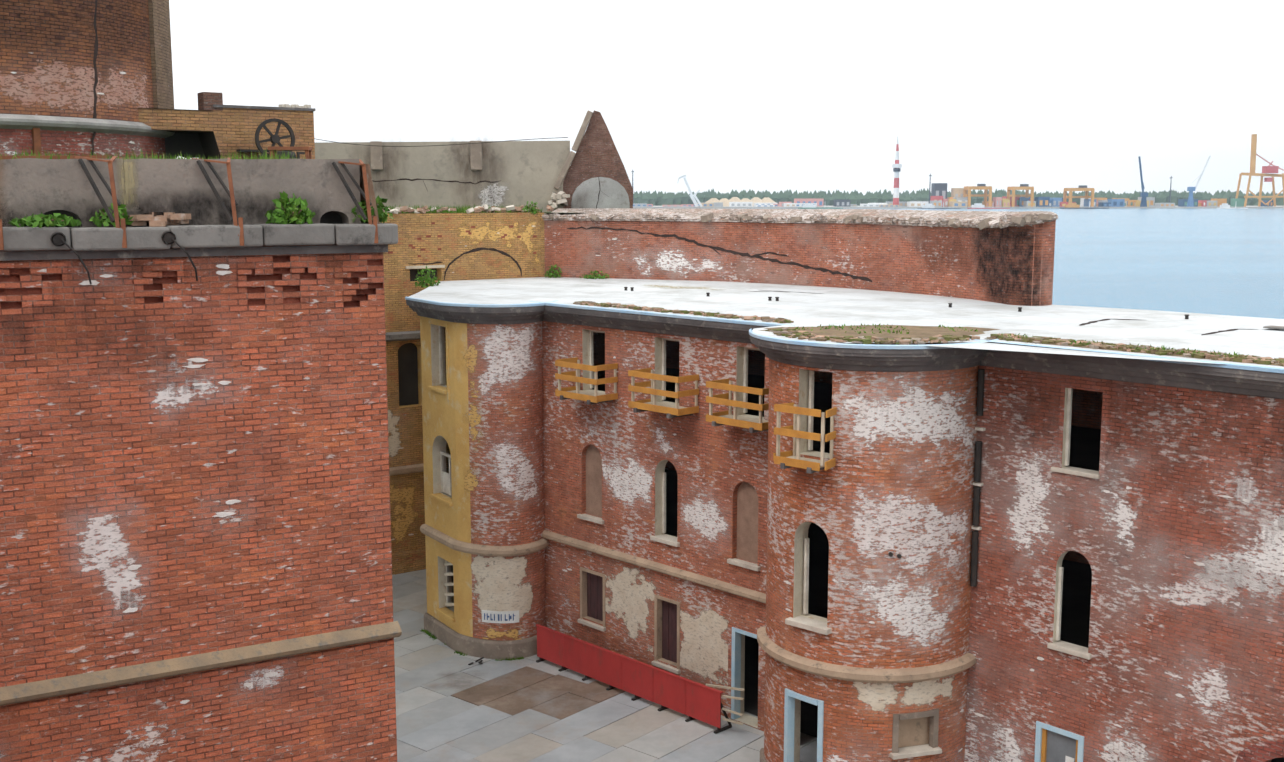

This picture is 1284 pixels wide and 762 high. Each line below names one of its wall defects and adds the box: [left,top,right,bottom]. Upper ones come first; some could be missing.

crack [90,0,98,155]
crack [567,181,872,292]
spalling [0,262,62,309]
spalling [236,255,317,305]
leakage [152,354,231,414]
leakage [76,513,146,613]
flaking render [471,555,533,640]
flaking render [605,567,656,652]
flaking render [680,610,729,686]
leakage [832,490,970,648]
leakage [1121,506,1284,608]
leakage [71,722,176,762]